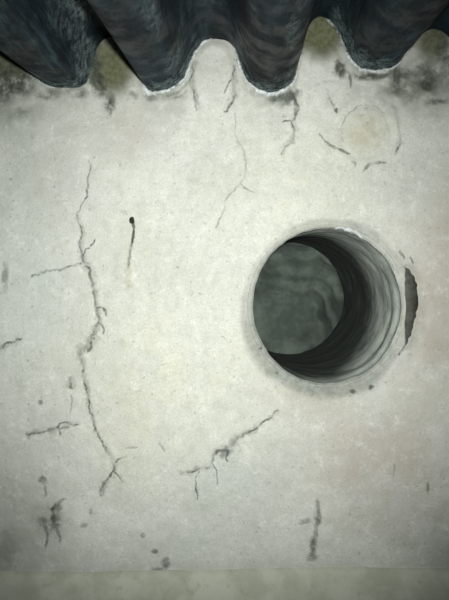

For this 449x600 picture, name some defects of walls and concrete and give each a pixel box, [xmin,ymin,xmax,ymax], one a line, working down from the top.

leakage [0,63,30,96]
leakage [272,90,296,104]
spalling [405,268,418,346]